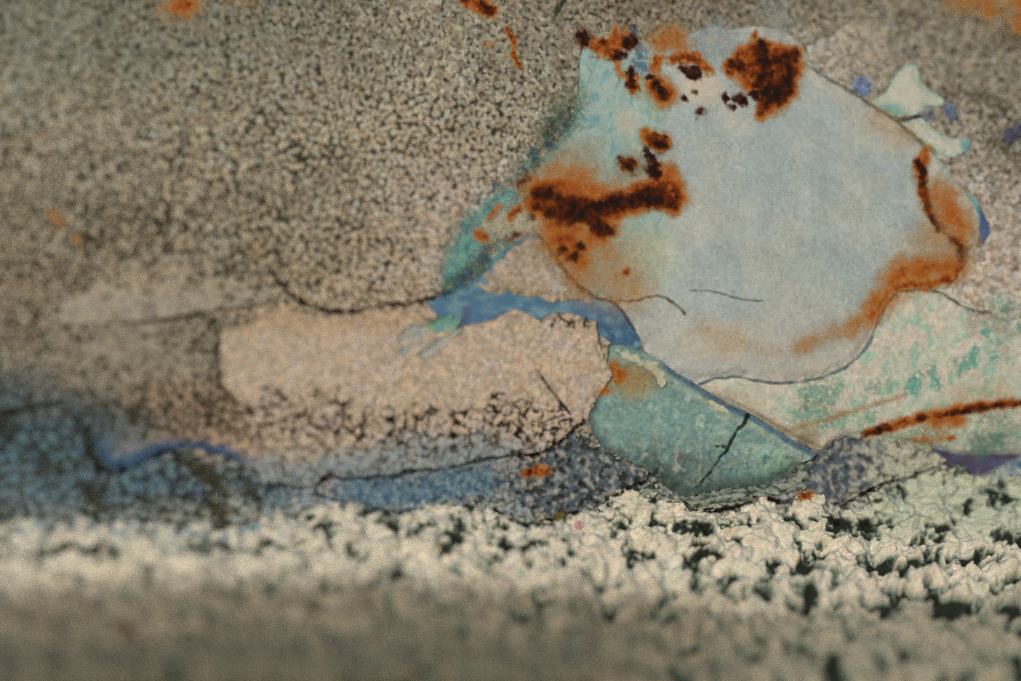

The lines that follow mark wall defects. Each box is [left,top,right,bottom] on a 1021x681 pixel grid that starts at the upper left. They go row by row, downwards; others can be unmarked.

rust [458,0,522,68]
rust [575,23,805,122]
crack [272,272,452,314]
peeling [45,18,990,497]
rust [473,126,689,304]
rust [794,145,980,353]
crack [266,375,581,515]
rust [519,462,551,479]
crack [493,507,579,528]
crack [667,413,798,513]
crack [822,461,947,526]
rust [862,397,1021,444]